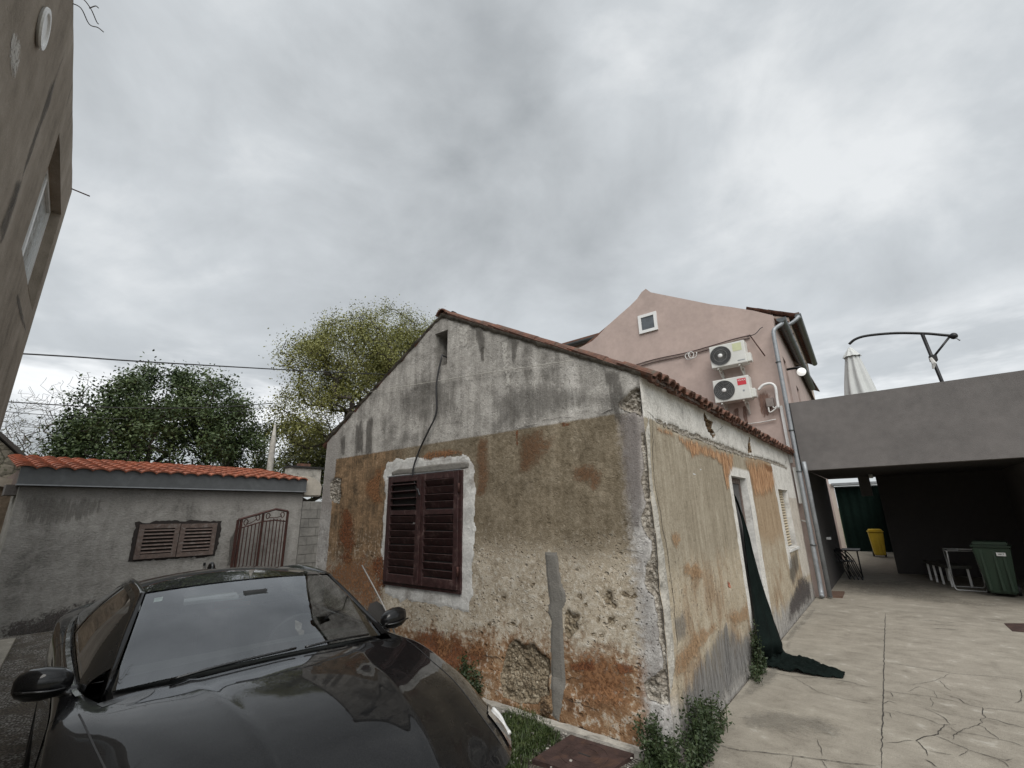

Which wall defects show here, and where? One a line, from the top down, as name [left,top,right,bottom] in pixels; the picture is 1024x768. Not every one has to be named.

damp [458,327,484,360]
damp [605,371,623,422]
flaking render [618,387,642,416]
damp [341,417,373,454]
rust [746,461,775,496]
rust [326,508,385,610]
spalling [565,433,670,704]
damp [789,553,811,621]
rust [410,627,486,671]
flaking render [500,639,550,704]
rust [570,650,633,712]
crack [771,663,1022,767]